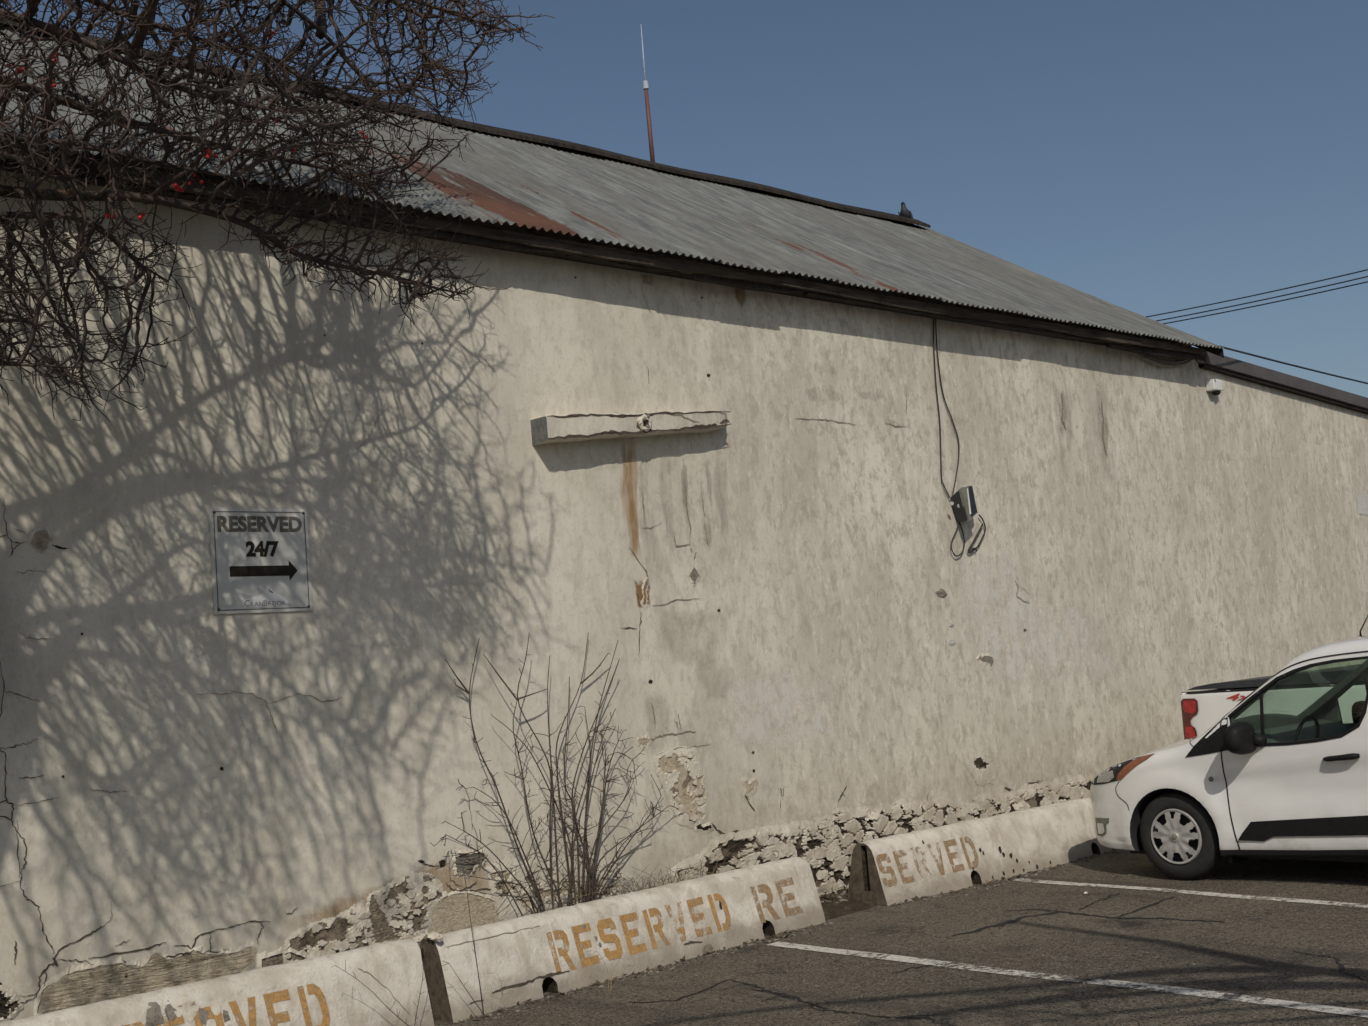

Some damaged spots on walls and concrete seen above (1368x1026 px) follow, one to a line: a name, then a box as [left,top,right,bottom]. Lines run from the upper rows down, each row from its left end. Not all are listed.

spalling [28,527,69,555]
crack [198,691,339,734]
crack [0,661,297,1016]
flaking render [635,733,1097,894]
spalling [0,849,634,1026]